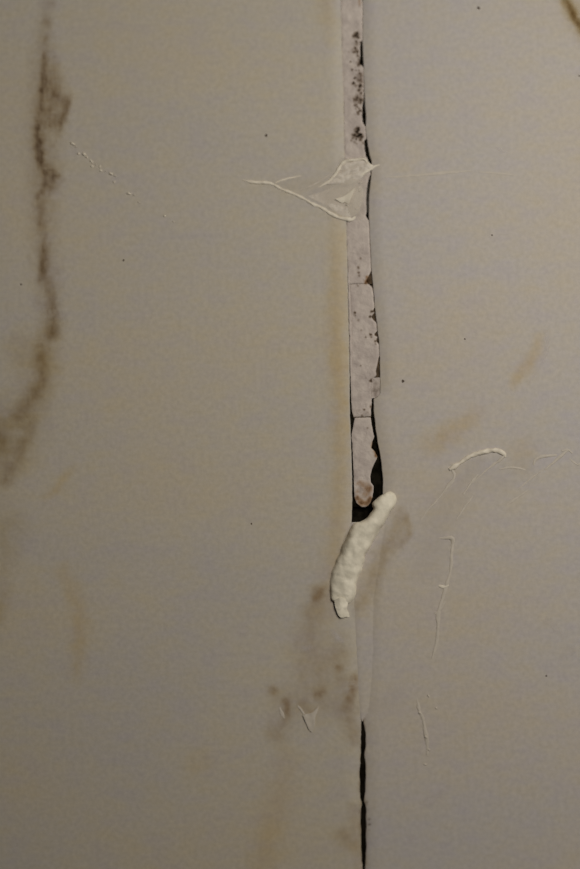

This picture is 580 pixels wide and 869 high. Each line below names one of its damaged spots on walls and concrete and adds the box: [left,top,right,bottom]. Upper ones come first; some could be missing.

crack [357,41,365,66]
crack [362,100,371,220]
crack [350,272,382,507]
crack [358,721,366,869]